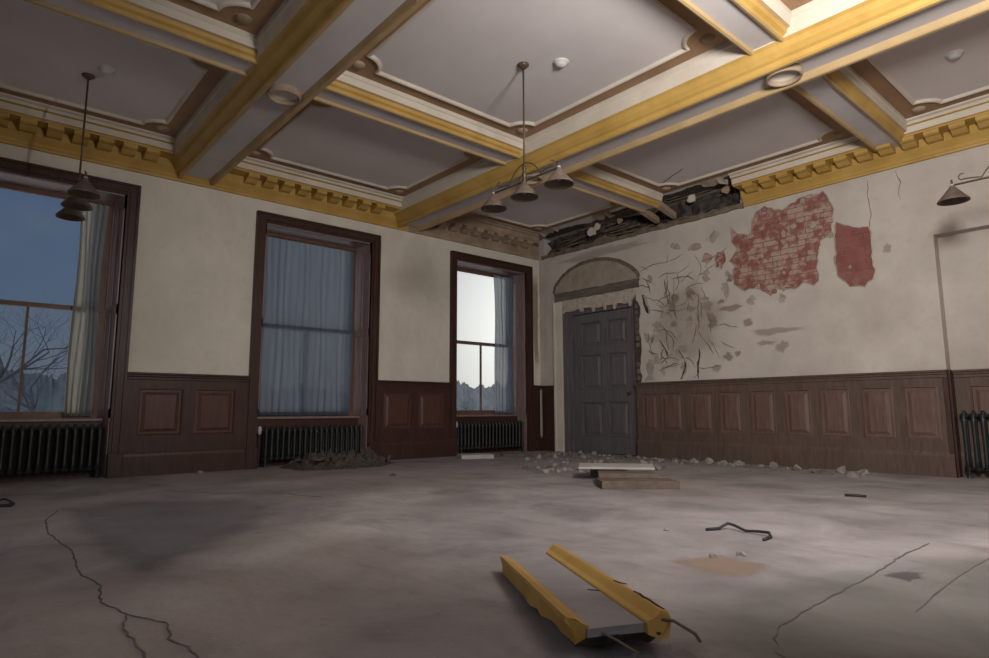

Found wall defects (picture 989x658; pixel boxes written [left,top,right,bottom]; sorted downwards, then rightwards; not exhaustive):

flaking render [671,190,877,305]
crack [45,510,199,658]
crack [773,543,929,658]
crack [915,558,989,612]